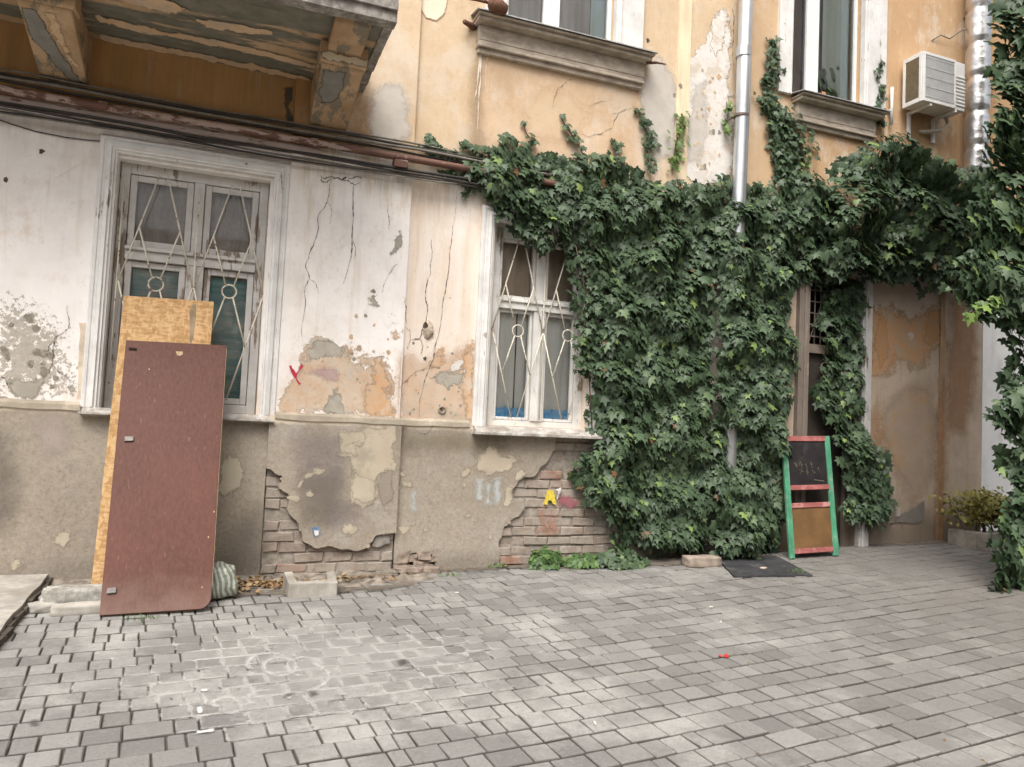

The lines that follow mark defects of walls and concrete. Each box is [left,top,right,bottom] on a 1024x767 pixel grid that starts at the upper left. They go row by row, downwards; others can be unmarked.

peeling [22,8,82,83]
peeling [95,0,369,104]
peeling [639,8,735,186]
spalling [0,377,44,399]
peeling [67,323,86,399]
crack [301,176,362,334]
peeling [279,330,475,511]
crack [382,196,457,402]
peeling [872,304,949,378]
spalling [259,467,443,574]
spalling [461,438,721,567]